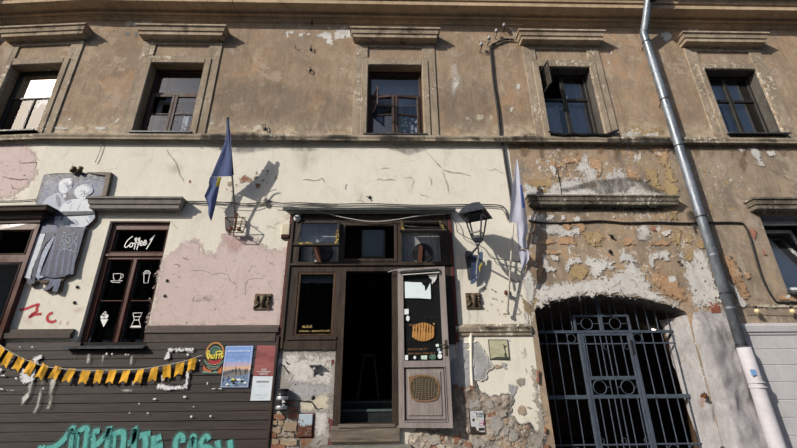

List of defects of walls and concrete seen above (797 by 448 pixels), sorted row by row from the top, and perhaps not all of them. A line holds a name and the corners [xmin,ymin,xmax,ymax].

peeling [286,26,352,46]
peeling [226,170,277,192]
crack [377,143,470,197]
peeling [738,145,776,167]
peeling [513,123,722,324]
peeling [717,247,797,311]
flaking render [271,391,333,448]
spalling [407,339,550,448]